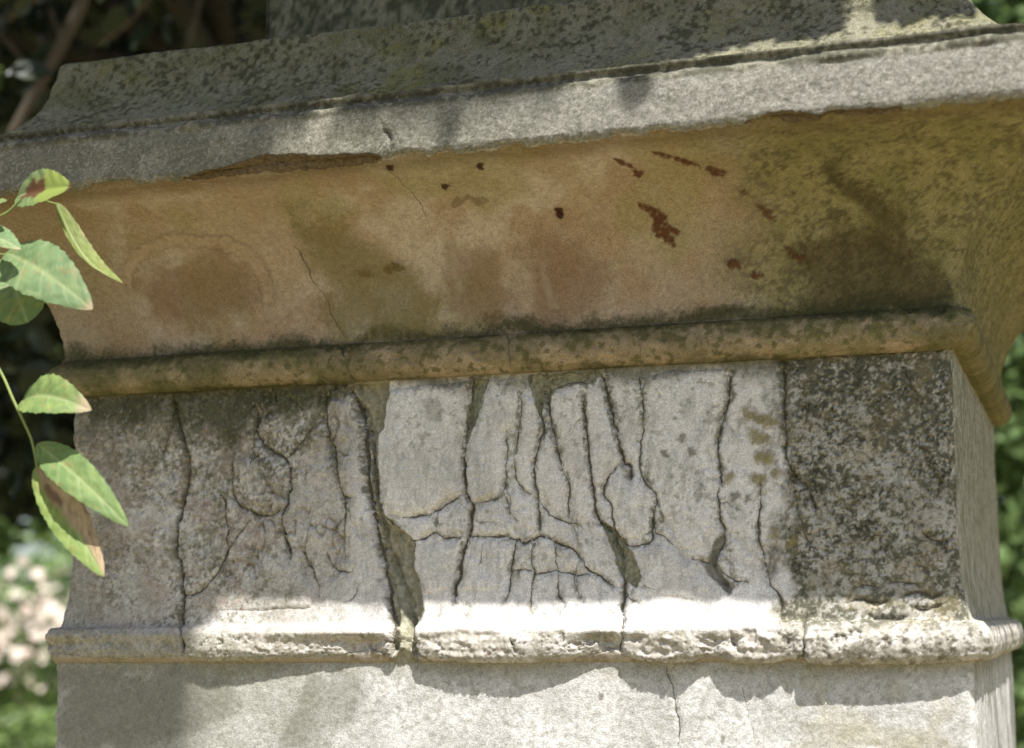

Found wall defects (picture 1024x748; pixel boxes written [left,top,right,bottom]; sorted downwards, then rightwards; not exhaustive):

spalling [181,153,380,181]
rust [614,159,643,178]
rust [652,152,726,177]
rust [638,204,680,247]
rust [728,259,763,279]
crack [163,246,744,653]
spalling [237,379,509,665]
crack [758,363,816,660]
crack [850,581,944,621]
crack [666,668,681,744]